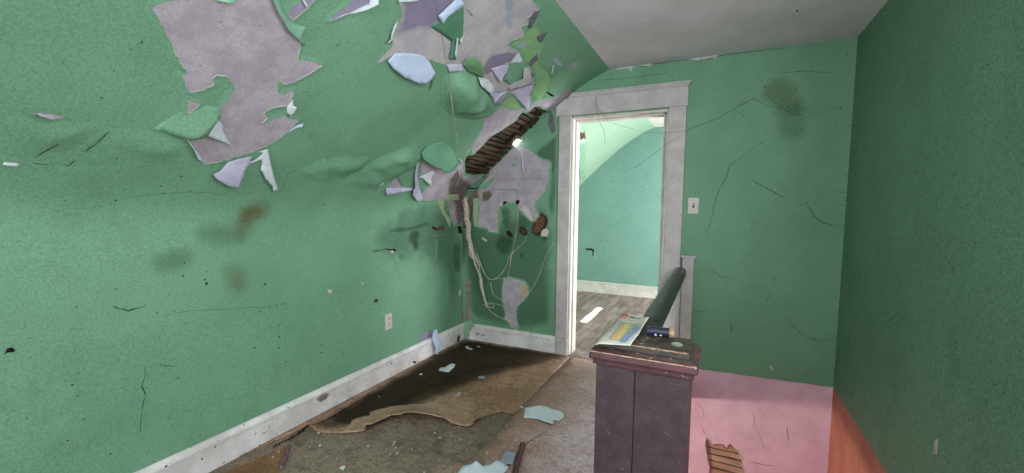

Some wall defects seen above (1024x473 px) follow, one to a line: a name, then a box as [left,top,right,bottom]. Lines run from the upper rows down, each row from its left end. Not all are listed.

flaking render [331,0,370,20]
flaking render [152,0,321,164]
flaking render [375,0,574,242]
flaking render [501,276,530,330]
crack [140,364,169,433]
damp [335,333,560,426]
spalling [705,437,745,473]